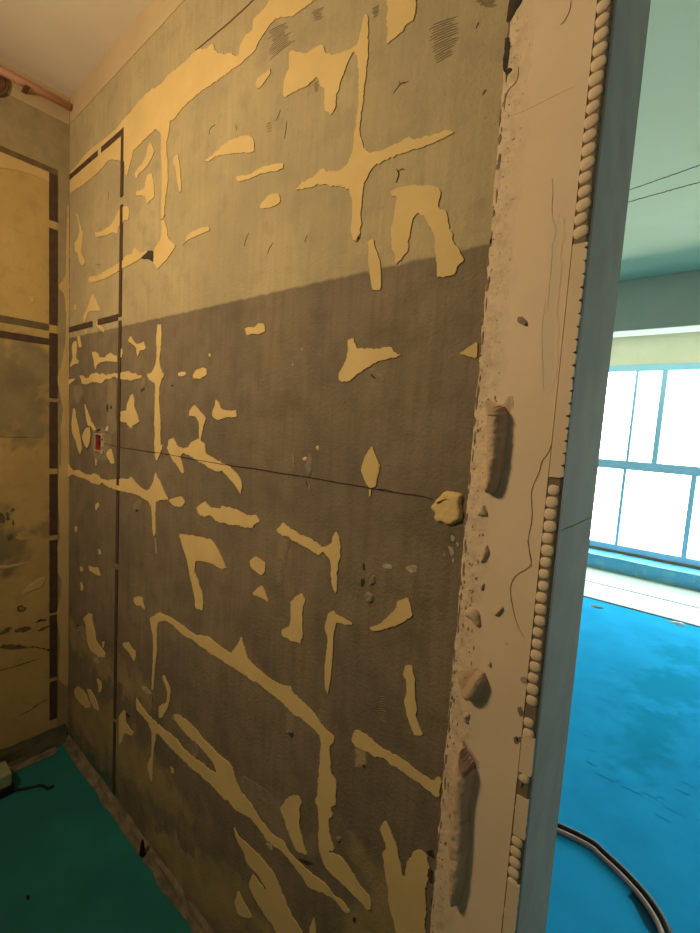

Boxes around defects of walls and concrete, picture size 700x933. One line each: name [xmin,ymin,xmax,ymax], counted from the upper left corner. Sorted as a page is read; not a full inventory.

peeling [70,0,316,283]
peeling [283,14,453,290]
peeling [245,323,266,335]
peeling [339,338,401,382]
peeling [0,205,243,711]
crack [105,443,433,499]
peeling [361,446,381,497]
peeling [197,502,260,528]
peeling [250,556,266,575]
peeling [277,523,341,593]
peeling [351,473,489,933]
peeling [118,593,373,933]